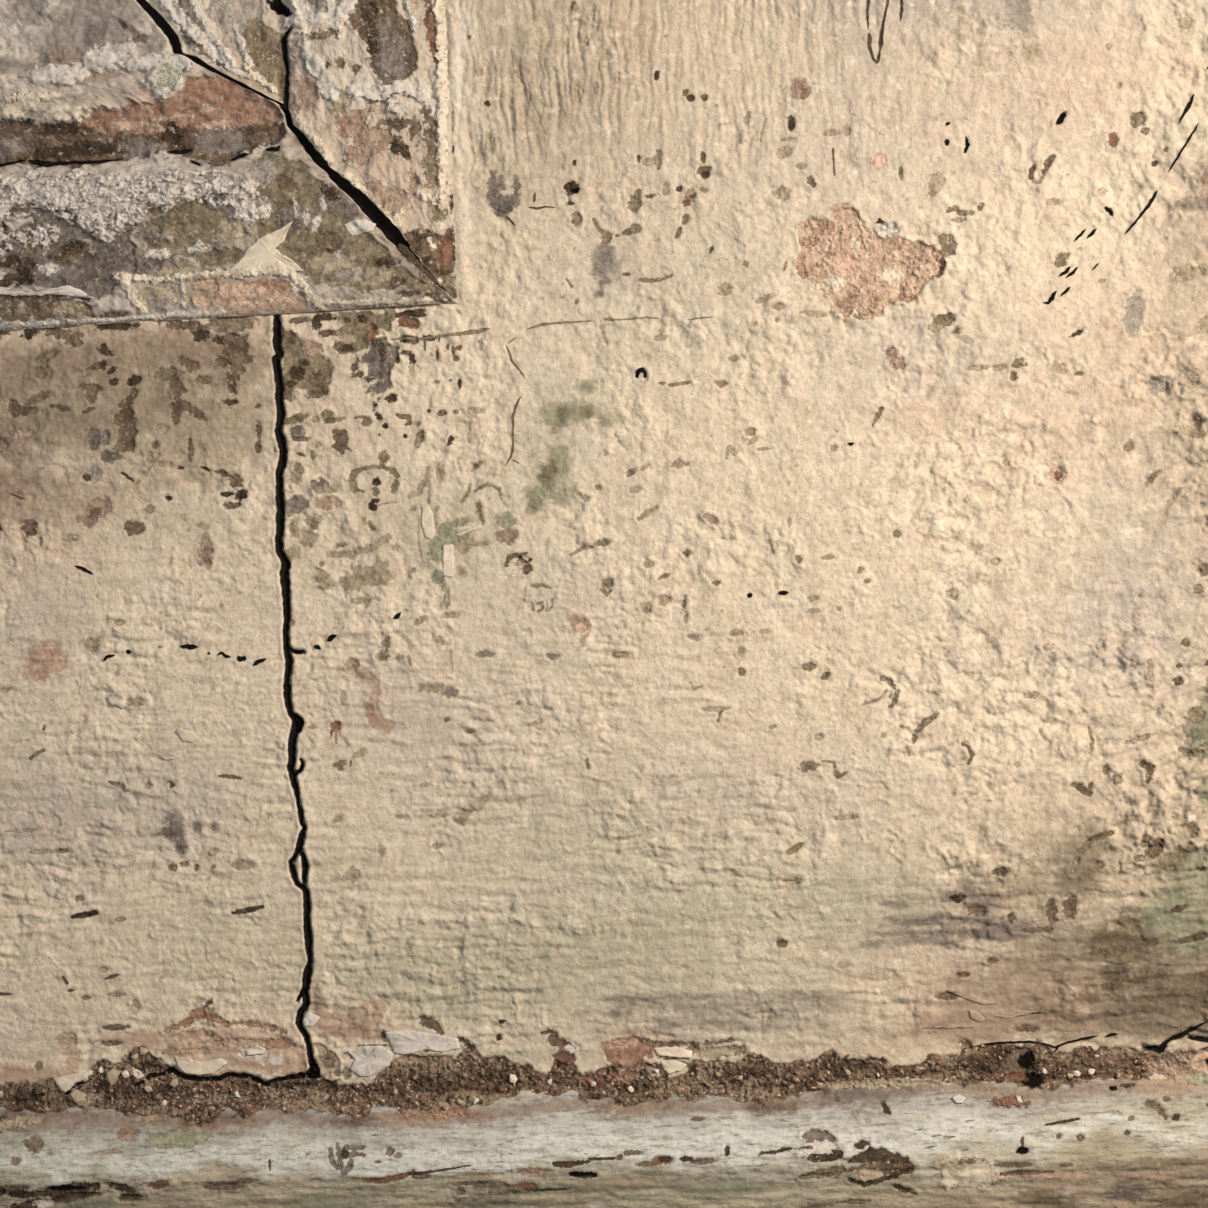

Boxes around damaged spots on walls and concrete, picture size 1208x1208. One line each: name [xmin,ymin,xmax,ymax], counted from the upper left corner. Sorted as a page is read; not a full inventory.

crack [0,159,121,167]
crack [136,0,443,289]
peeling [0,0,554,618]
flaking render [784,203,984,321]
crack [135,315,336,1086]
water stain [1197,782,1208,803]
water stain [900,887,1026,944]
spalling [1007,895,1077,933]
water stain [1093,844,1208,990]
spalling [0,966,1208,1166]
crack [977,1021,1208,1053]
spalling [993,1137,1074,1176]